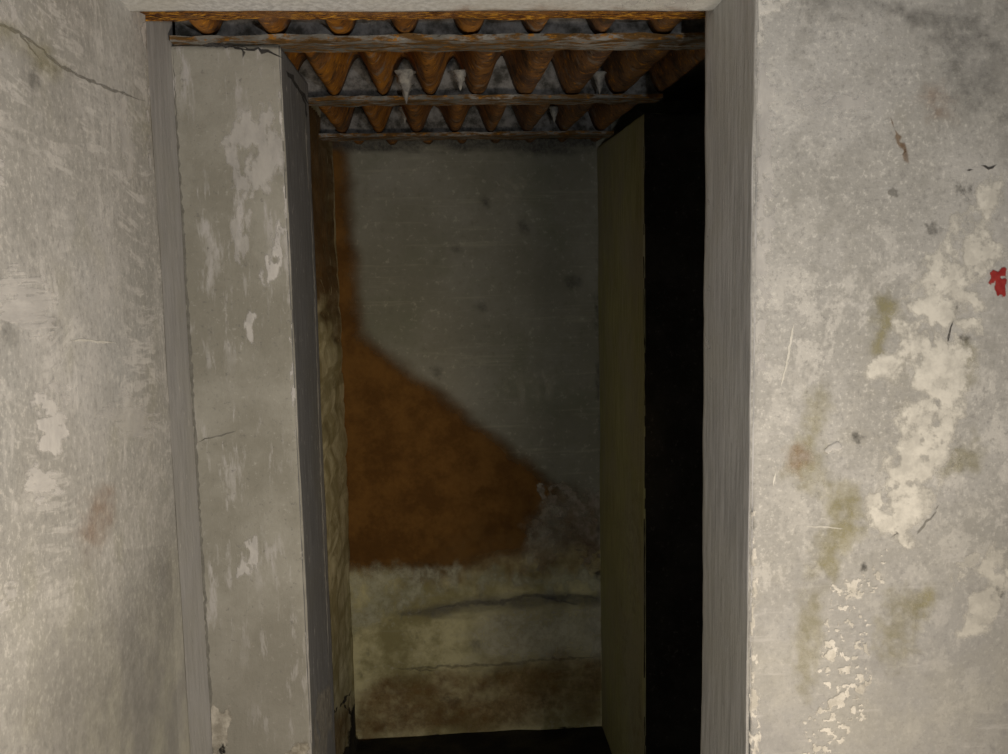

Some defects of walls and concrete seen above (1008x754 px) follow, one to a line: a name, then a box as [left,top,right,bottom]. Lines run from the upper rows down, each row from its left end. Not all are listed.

rust [309,106,554,571]